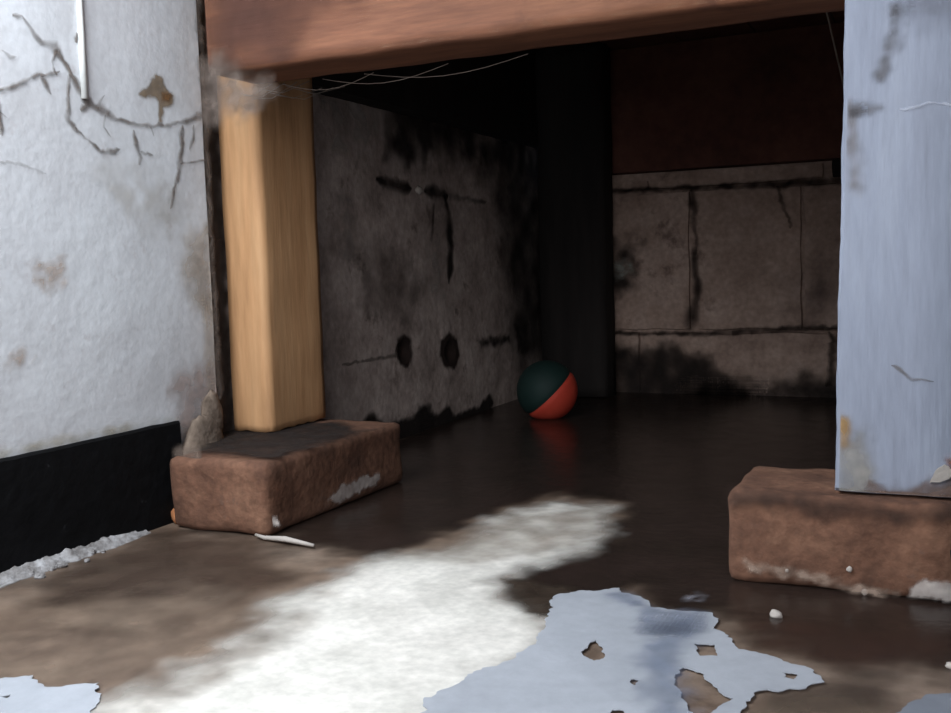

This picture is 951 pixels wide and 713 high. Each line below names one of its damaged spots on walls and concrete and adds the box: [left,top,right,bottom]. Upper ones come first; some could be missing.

crack [0,14,207,209]
rust [139,75,173,122]
water stain [174,0,289,441]
crack [376,177,453,283]
water stain [388,112,542,364]
crack [613,177,841,387]
water stain [43,529,289,604]
water stain [274,345,951,670]
rust [840,418,870,491]